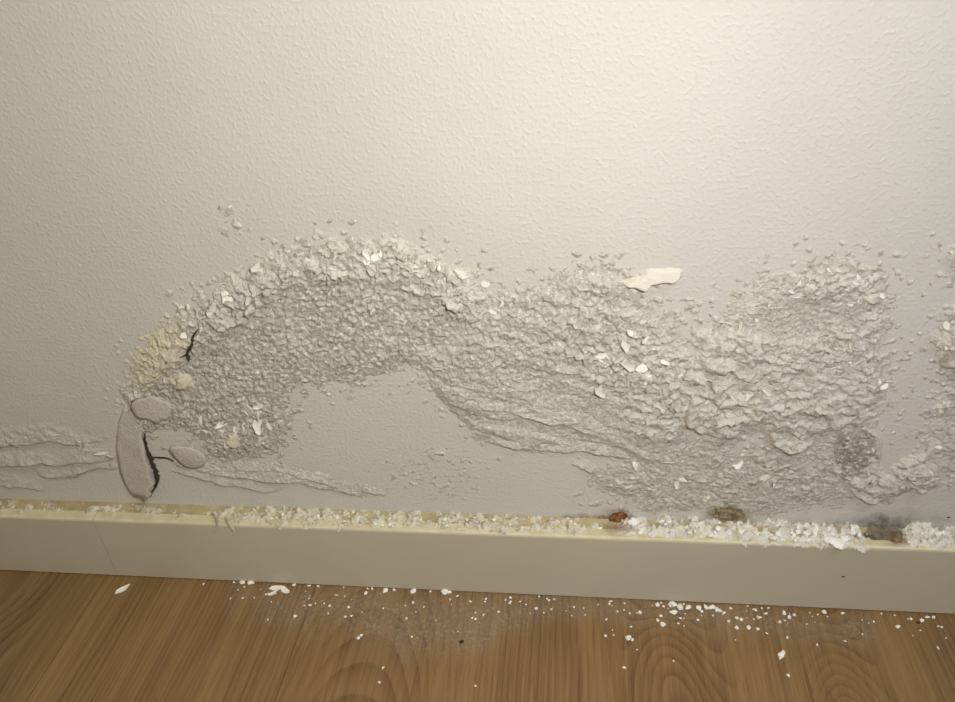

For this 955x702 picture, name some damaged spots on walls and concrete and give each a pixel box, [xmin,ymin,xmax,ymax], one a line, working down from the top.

spalling [571,232,955,517]
peeling [94,402,155,502]
crack [143,433,174,497]
peeling [268,585,290,596]